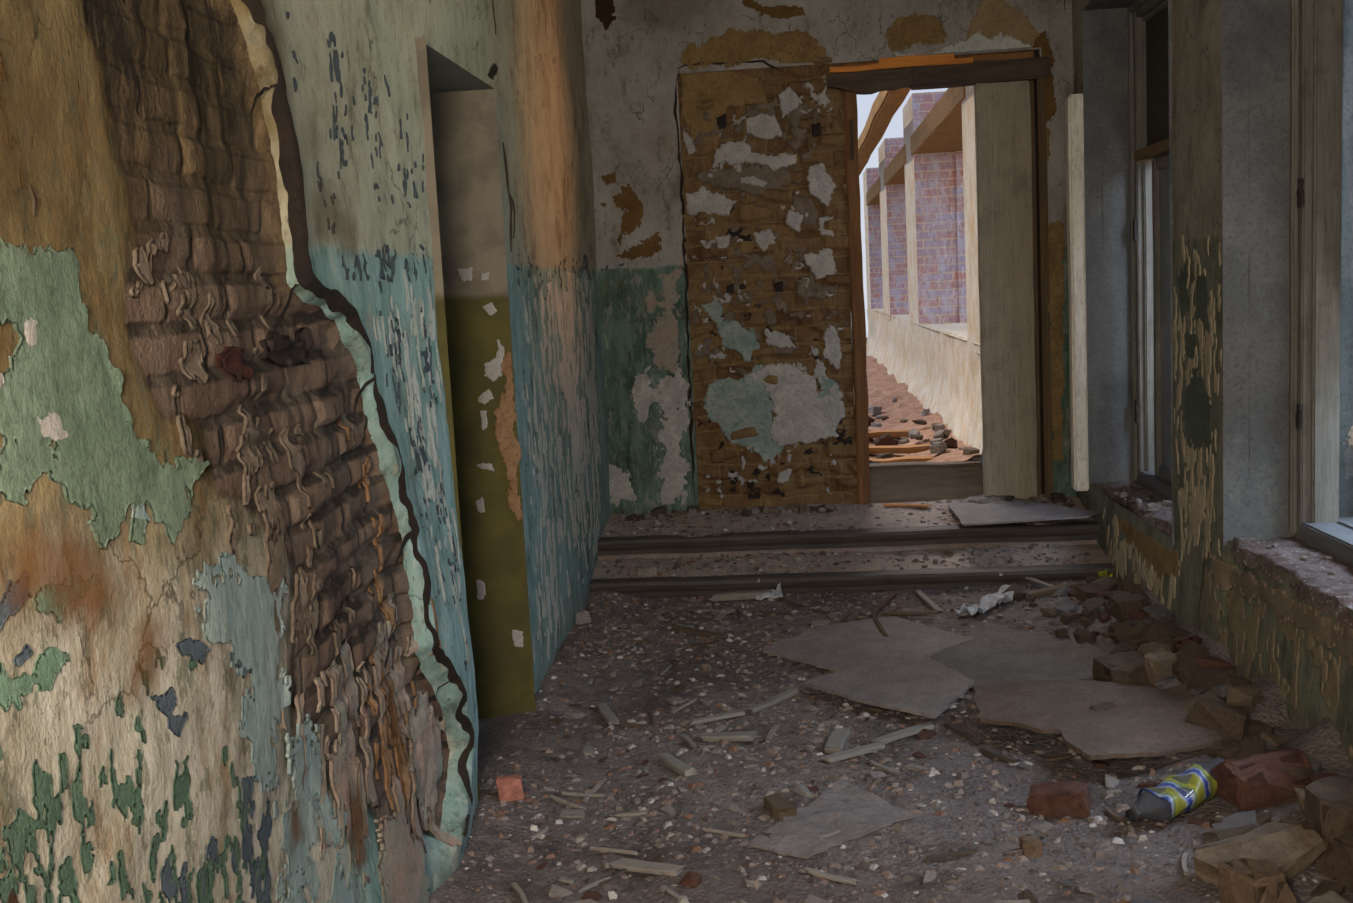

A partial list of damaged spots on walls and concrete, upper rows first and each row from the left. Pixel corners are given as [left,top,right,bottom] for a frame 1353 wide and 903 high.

flaking render [0,0,489,903]
crack [241,0,475,837]
peeling [477,171,662,665]
flaking render [595,0,616,31]
flaking render [631,0,853,506]